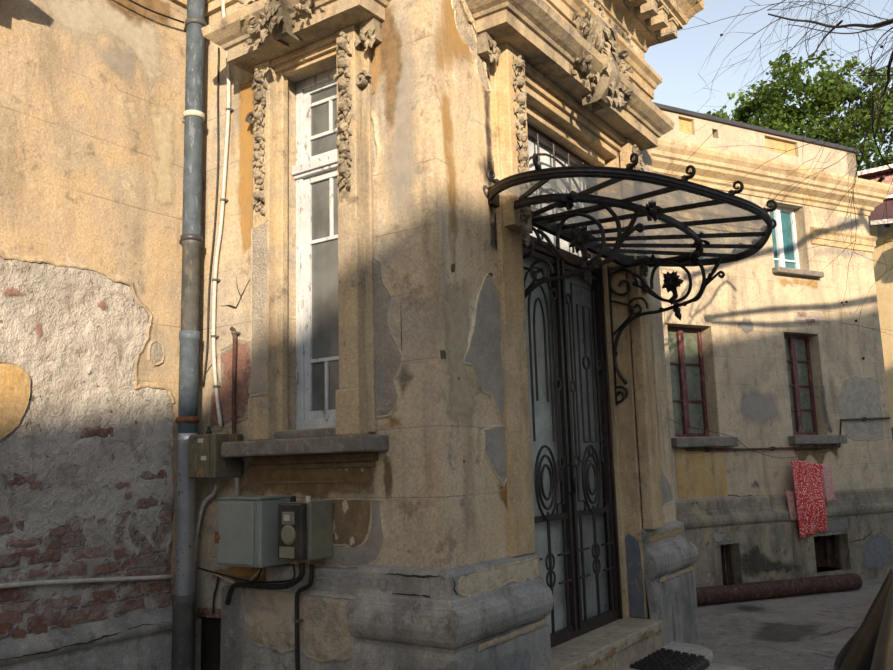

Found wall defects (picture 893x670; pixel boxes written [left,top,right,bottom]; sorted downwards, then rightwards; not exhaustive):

leakage [41,0,170,89]
crack [225,278,251,309]
spalling [374,255,404,421]
spalling [0,249,176,640]
spalling [463,272,507,488]
spalling [837,375,884,442]
peeling [323,497,372,551]
crack [385,573,458,598]
peeling [625,527,683,617]
crack [0,622,165,660]
peeling [239,588,358,665]